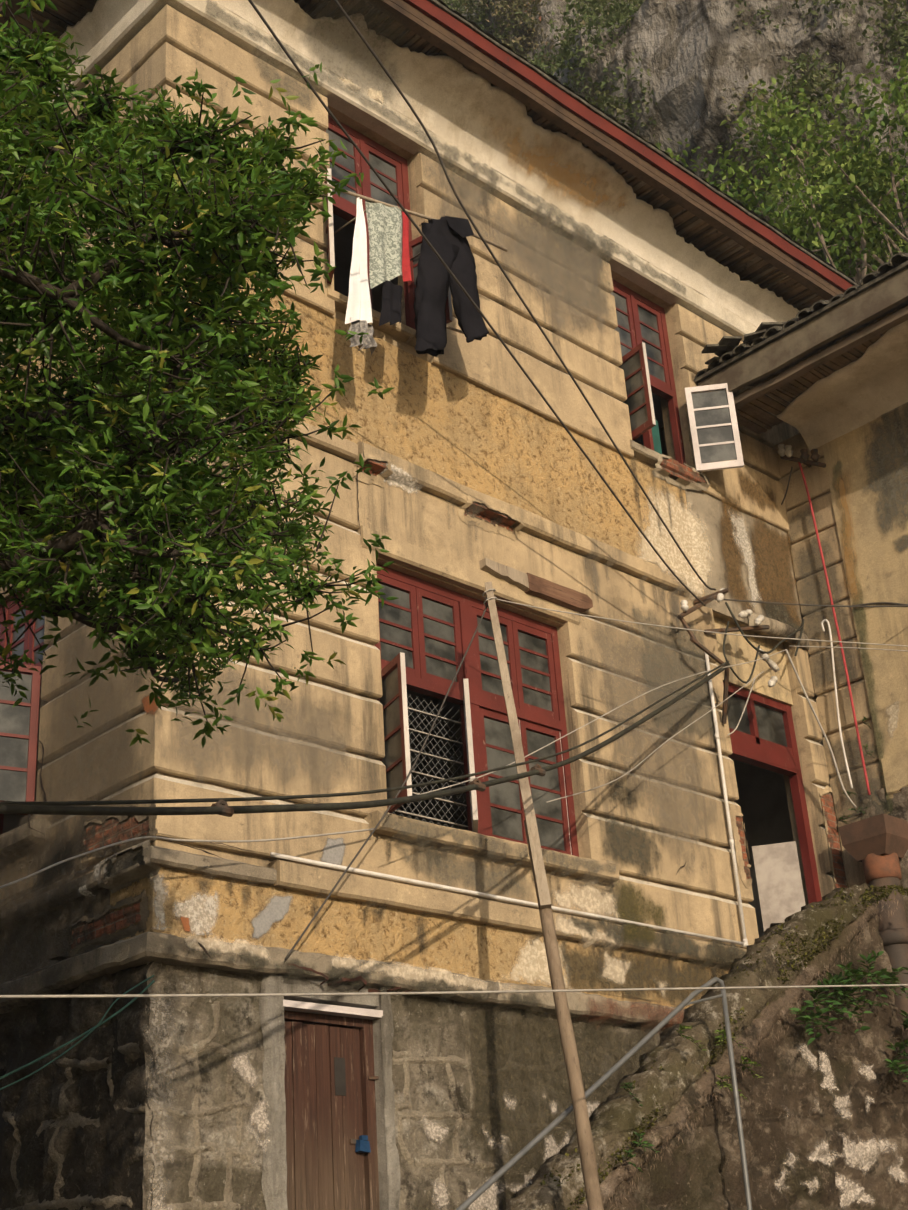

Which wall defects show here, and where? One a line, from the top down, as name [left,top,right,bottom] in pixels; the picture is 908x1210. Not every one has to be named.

water stain [865,402,908,551]
water stain [542,460,858,992]
water stain [830,731,880,825]
flaking render [49,804,218,961]
water stain [386,815,534,893]